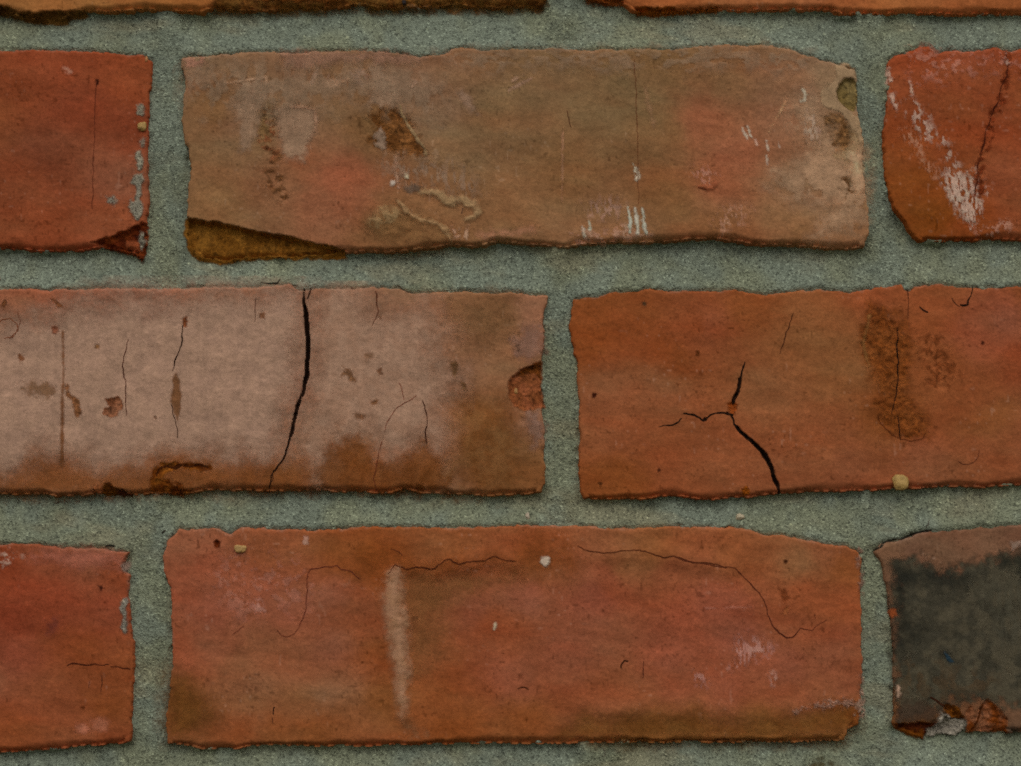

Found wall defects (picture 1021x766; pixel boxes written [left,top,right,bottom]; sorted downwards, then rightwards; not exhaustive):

crack [974,50,1012,197]
spalling [184,218,346,265]
crack [269,288,312,489]
crack [659,362,780,495]